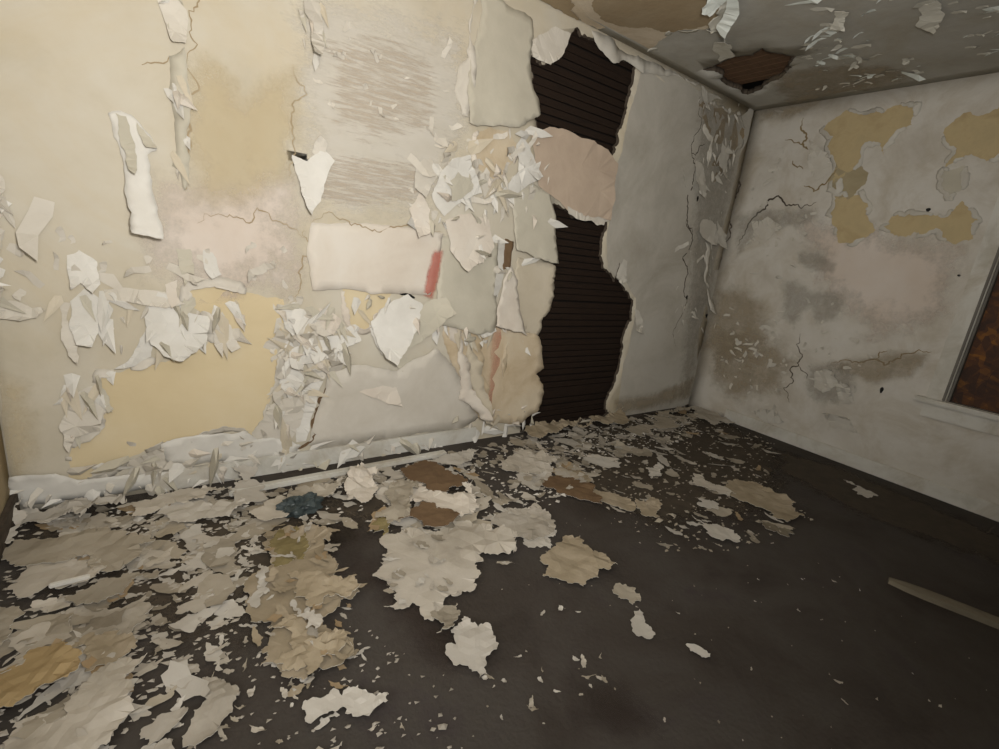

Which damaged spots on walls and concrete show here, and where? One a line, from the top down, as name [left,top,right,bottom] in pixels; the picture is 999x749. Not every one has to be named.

peeling [788,0,925,91]
peeling [912,0,999,34]
peeling [6,197,76,261]
peeling [407,116,463,177]
spalling [457,0,745,207]
crack [721,119,837,260]
peeling [819,101,999,247]
peeling [65,255,392,493]
spalling [520,203,633,432]
damp [711,295,781,392]
crack [784,337,808,401]
crack [839,349,930,366]